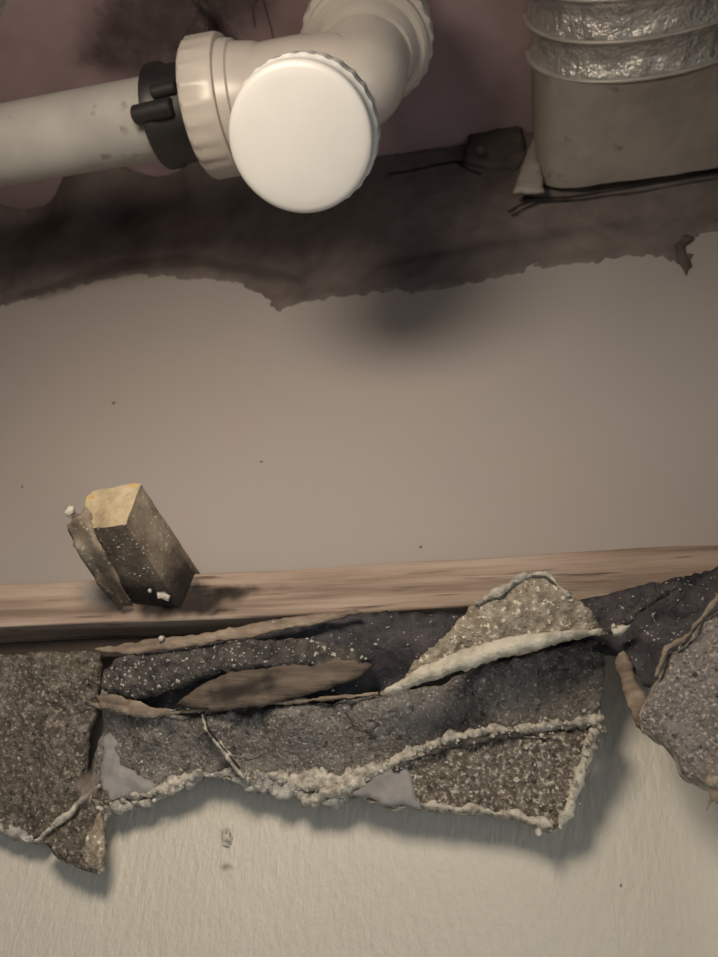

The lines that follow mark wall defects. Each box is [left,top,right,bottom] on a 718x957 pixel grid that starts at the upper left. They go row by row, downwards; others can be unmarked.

peeling [380,571,631,698]
spalling [0,710,607,876]